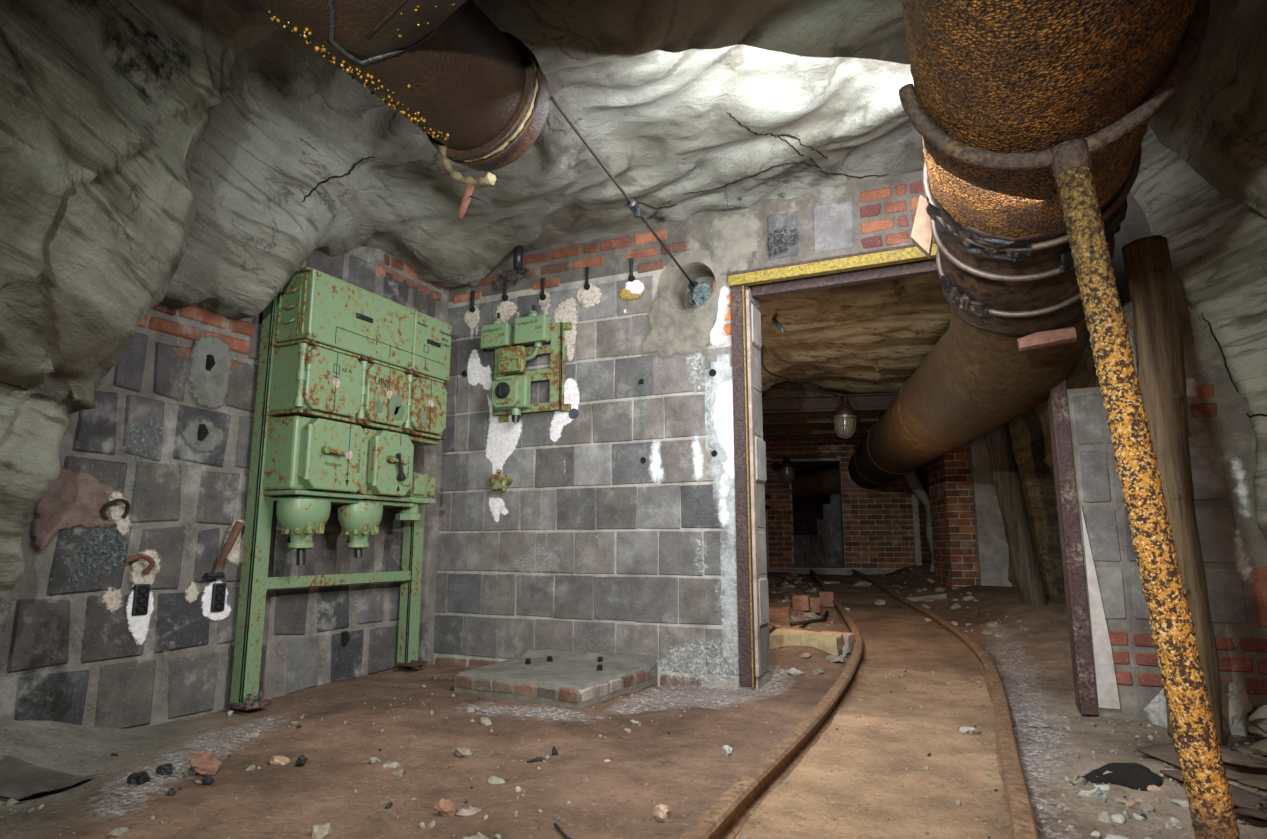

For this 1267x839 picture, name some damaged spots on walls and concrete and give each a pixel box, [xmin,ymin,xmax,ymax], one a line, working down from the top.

peeling [224,519,245,565]
leakage [535,353,783,713]
peeling [102,549,161,645]
peeling [185,581,232,621]